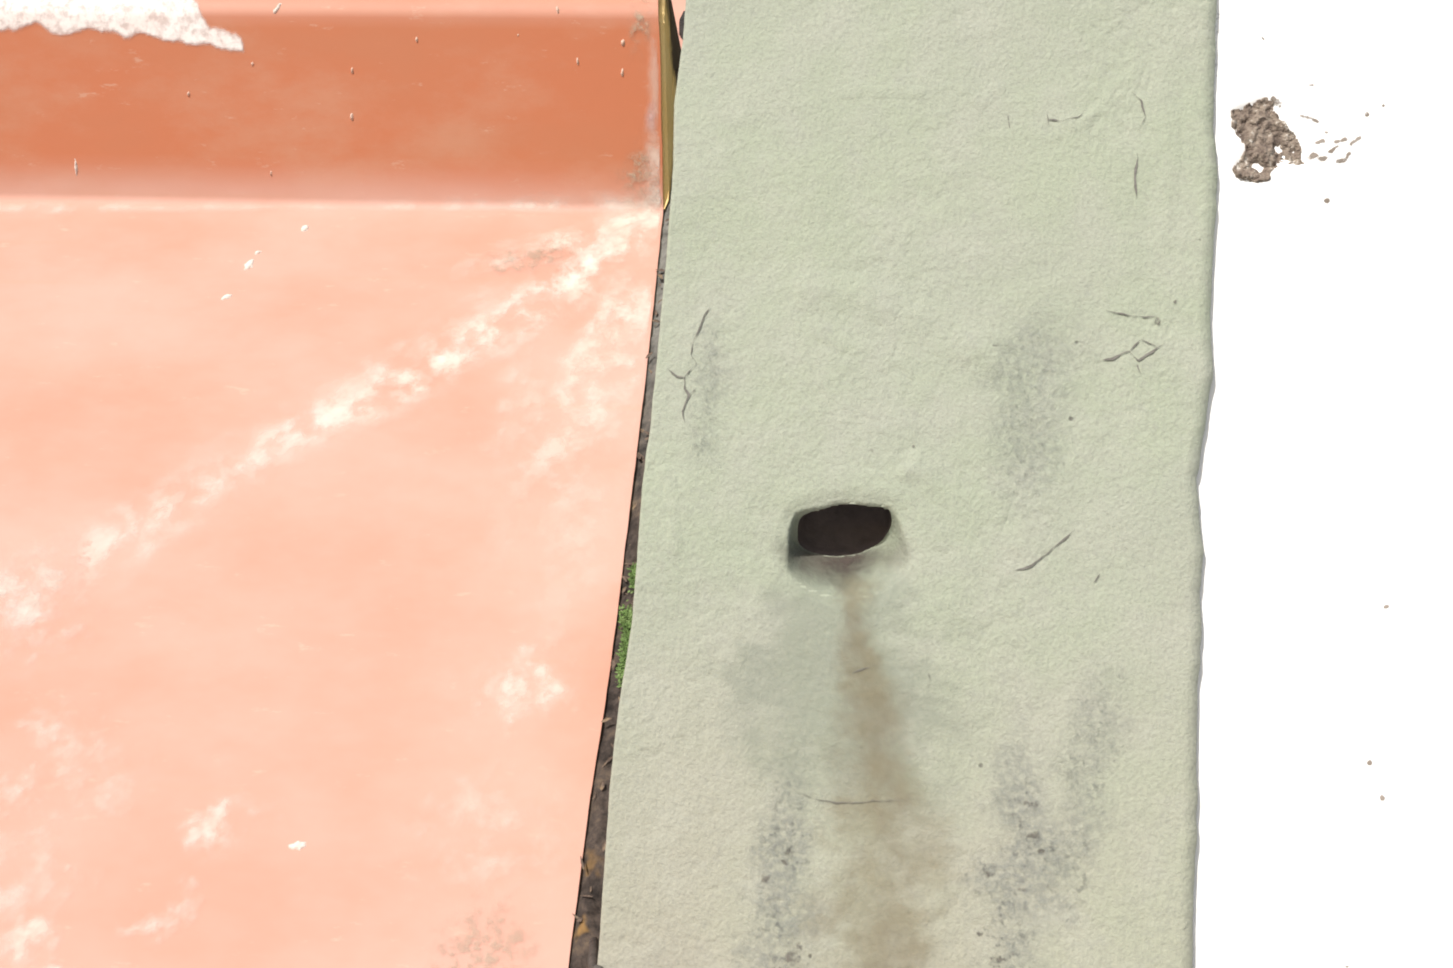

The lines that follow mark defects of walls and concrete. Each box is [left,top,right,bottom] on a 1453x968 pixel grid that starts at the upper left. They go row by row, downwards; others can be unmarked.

damp [802,553,872,574]